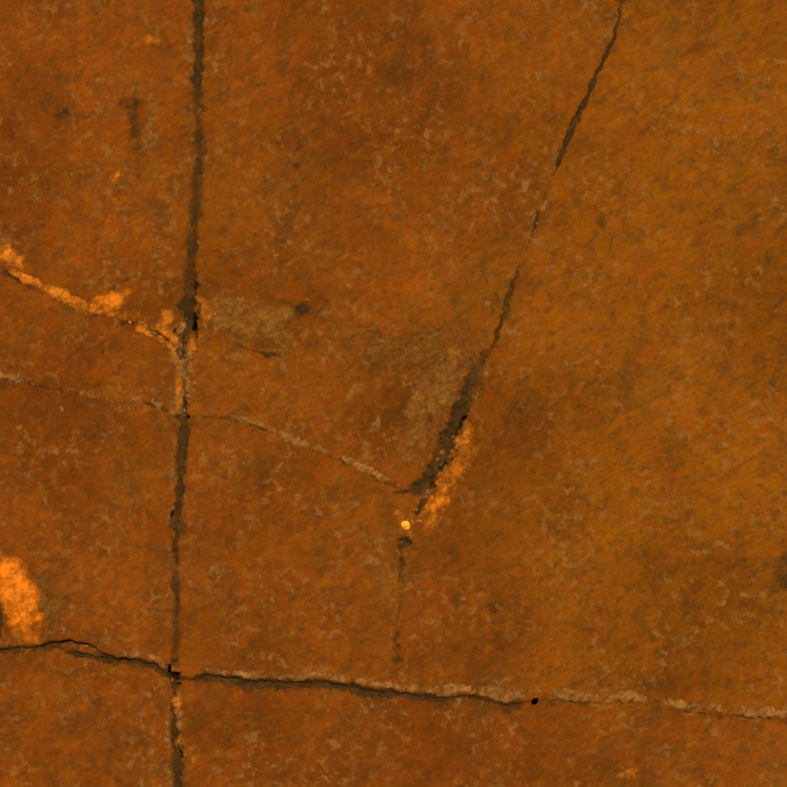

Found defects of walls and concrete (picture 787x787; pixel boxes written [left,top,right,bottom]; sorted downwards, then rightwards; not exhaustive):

crack [546,9,621,175]
crack [129,0,208,552]
crack [0,371,34,385]
crack [59,389,97,412]
crack [229,271,517,534]
corrosion [0,556,65,642]
crack [0,575,787,787]